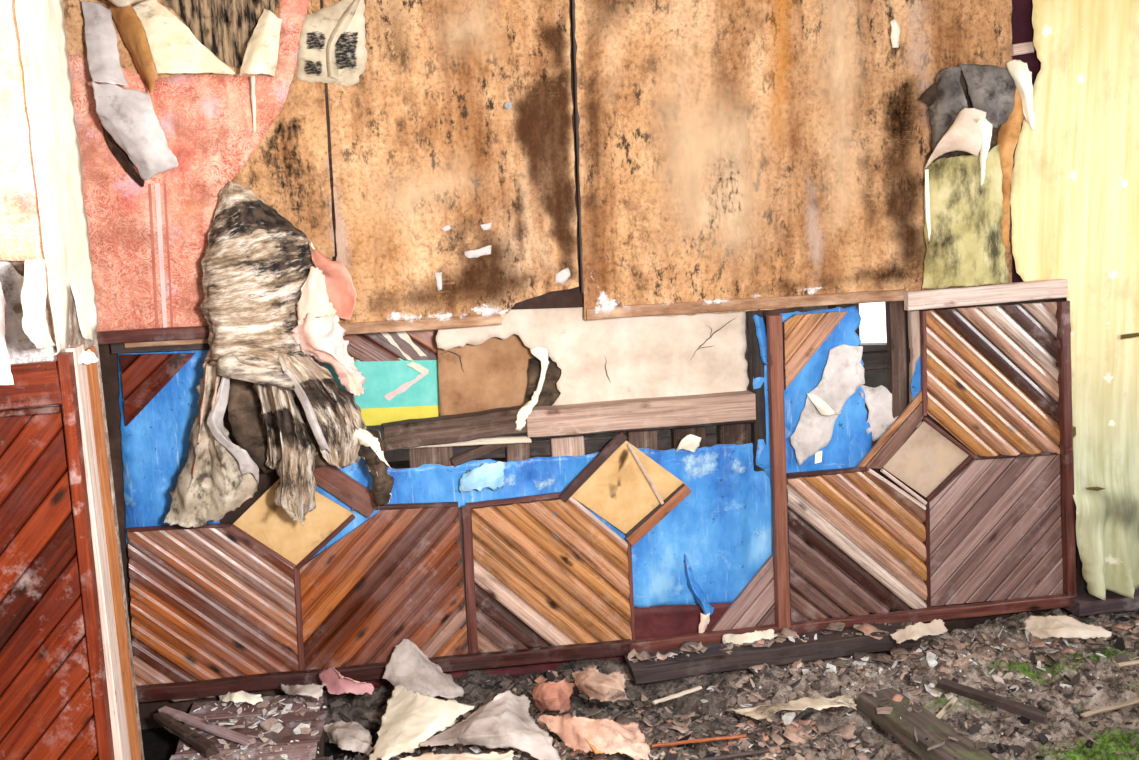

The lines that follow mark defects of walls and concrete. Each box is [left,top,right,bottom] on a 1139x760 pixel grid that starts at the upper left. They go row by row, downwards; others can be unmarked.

peeling [81,0,282,187]
leakage [492,25,576,277]
leakage [874,83,919,282]
flaking render [0,257,58,385]
peeling [515,358,549,431]
peeling [807,393,842,416]